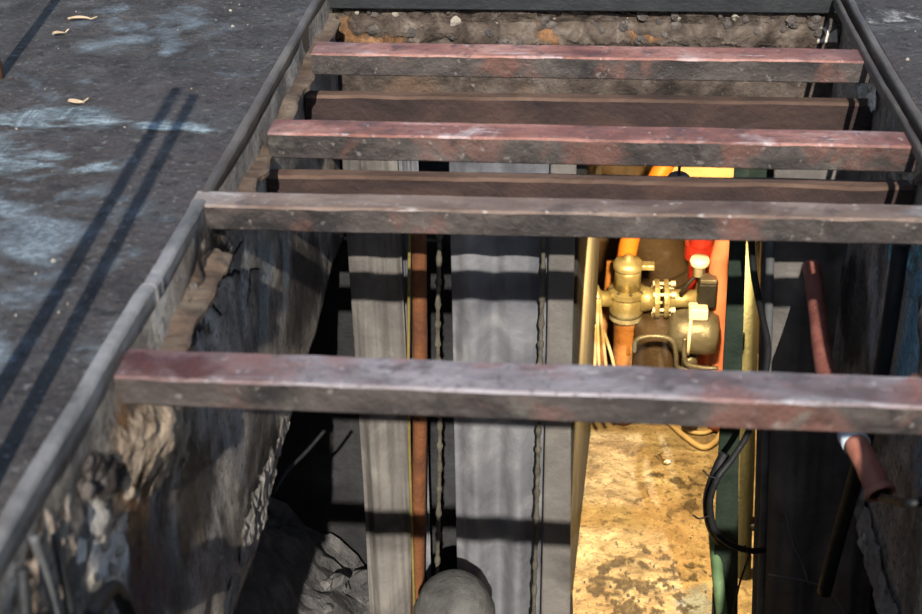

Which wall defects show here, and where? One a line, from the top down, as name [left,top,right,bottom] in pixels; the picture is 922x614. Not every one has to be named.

spalling [189,221,234,303]
crack [222,241,260,307]
spalling [191,318,215,346]
spalling [223,417,290,614]